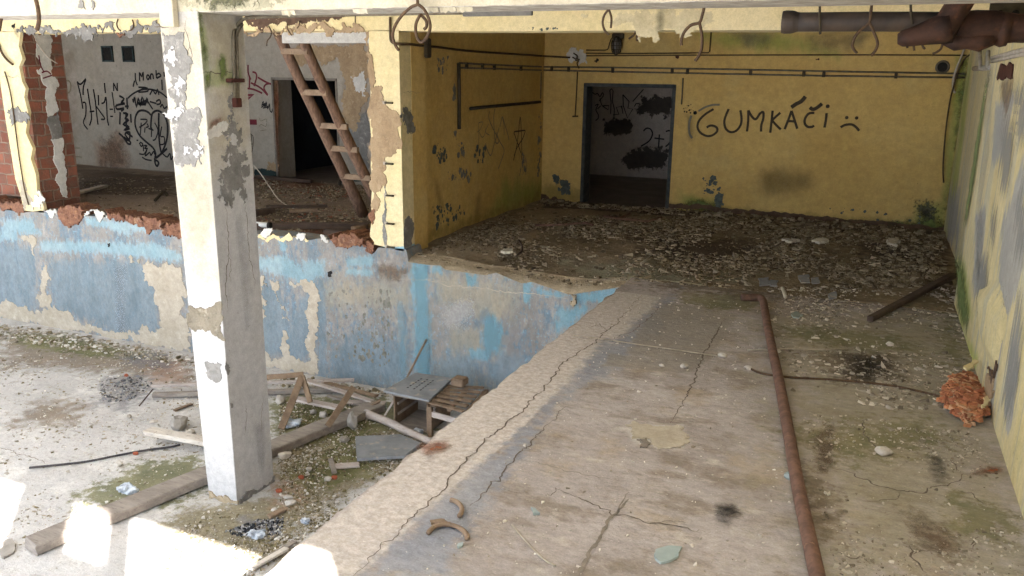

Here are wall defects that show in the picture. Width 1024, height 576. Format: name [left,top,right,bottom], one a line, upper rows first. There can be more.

spalling [7,106,30,127]
peeling [11,0,204,168]
spalling [244,9,416,254]
spalling [43,202,181,239]
damp [914,199,939,220]
peeling [0,255,226,353]
spalling [204,361,230,383]
peeling [260,275,321,375]
spalling [408,252,626,307]
crack [670,318,725,423]
crack [353,299,705,576]
crack [827,461,983,503]